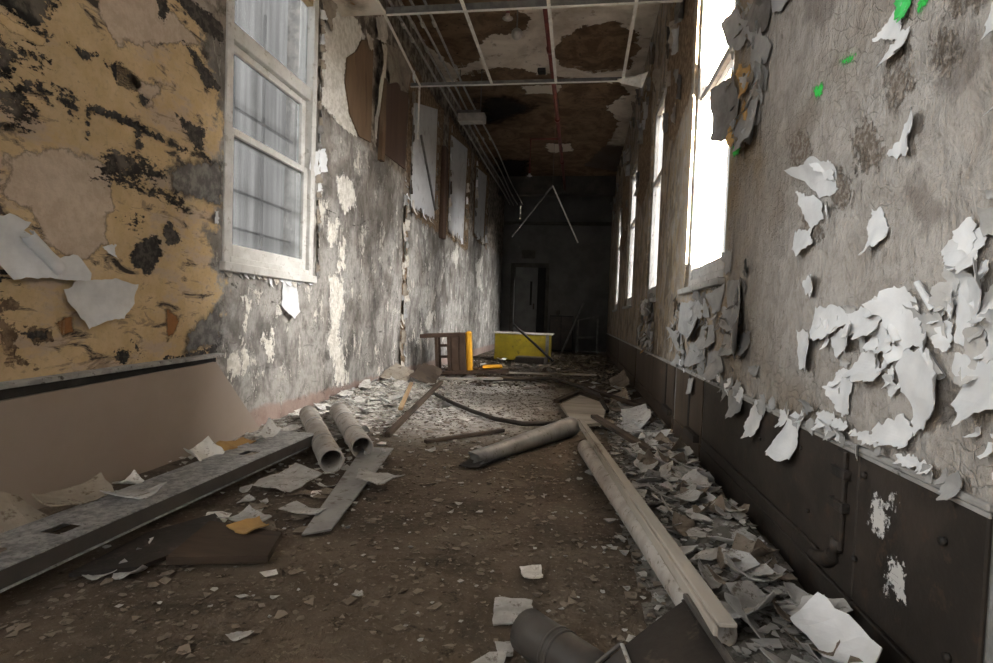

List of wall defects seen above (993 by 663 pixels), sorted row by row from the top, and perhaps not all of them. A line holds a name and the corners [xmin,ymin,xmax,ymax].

peeling [0,0,86,134]
flaking render [66,41,161,108]
flaking render [98,0,224,91]
peeling [175,113,211,163]
peeling [402,0,695,294]
peeling [709,0,788,159]
peeling [784,0,915,256]
spalling [928,0,993,82]
flaking render [0,148,190,371]
spalling [163,295,252,382]
flaking render [219,0,454,432]
peeling [636,290,655,354]